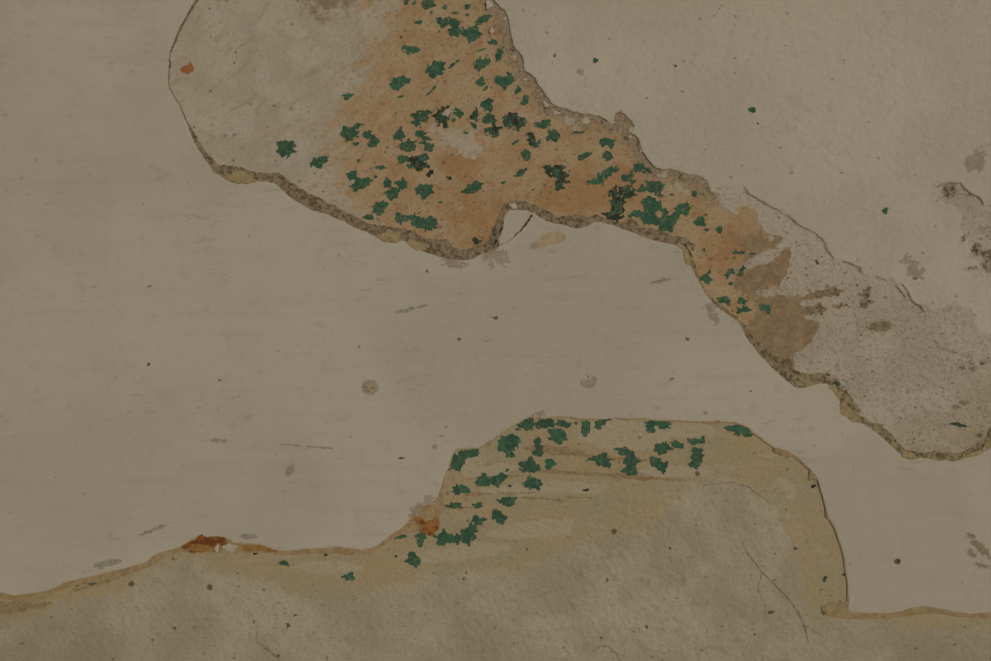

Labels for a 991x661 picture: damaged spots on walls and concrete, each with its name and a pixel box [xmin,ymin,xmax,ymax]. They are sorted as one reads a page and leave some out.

peeling [168,0,991,461]
peeling [0,409,991,661]